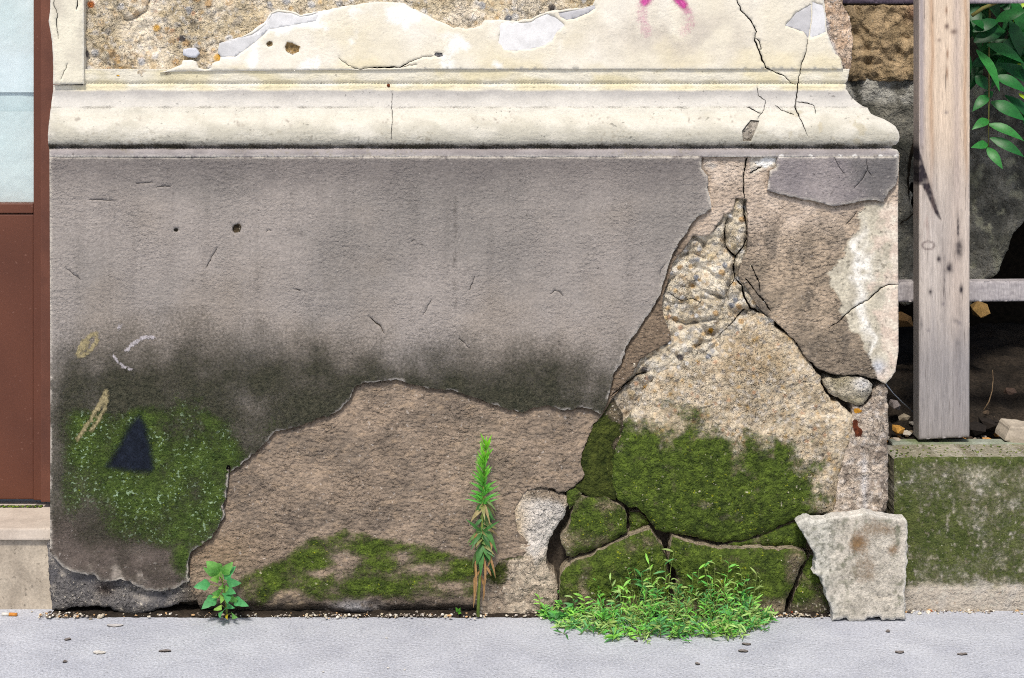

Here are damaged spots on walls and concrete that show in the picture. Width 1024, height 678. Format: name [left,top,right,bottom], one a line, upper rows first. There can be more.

spalling [85,0,595,76]
crack [737,1,815,129]
spalling [785,0,853,69]
crack [721,158,770,333]
water stain [50,340,613,545]
spalling [47,157,899,617]